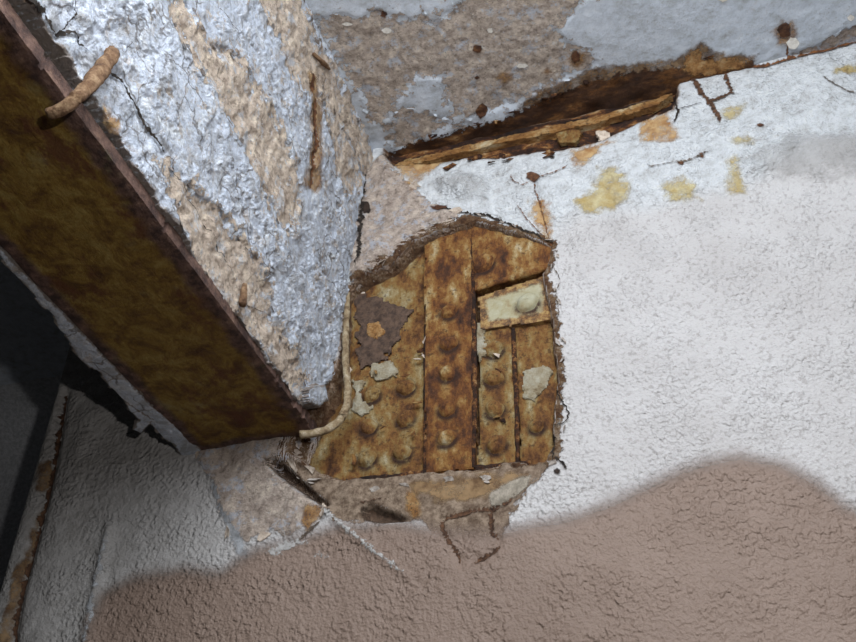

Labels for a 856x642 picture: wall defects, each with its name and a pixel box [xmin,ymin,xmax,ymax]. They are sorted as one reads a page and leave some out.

crack [29,0,87,49]
crack [753,41,856,68]
corrosion [304,71,323,192]
corrosion [384,43,754,184]
crack [674,72,737,122]
corrosion [729,157,744,193]
corrosion [531,200,552,236]
peeling [149,0,600,564]